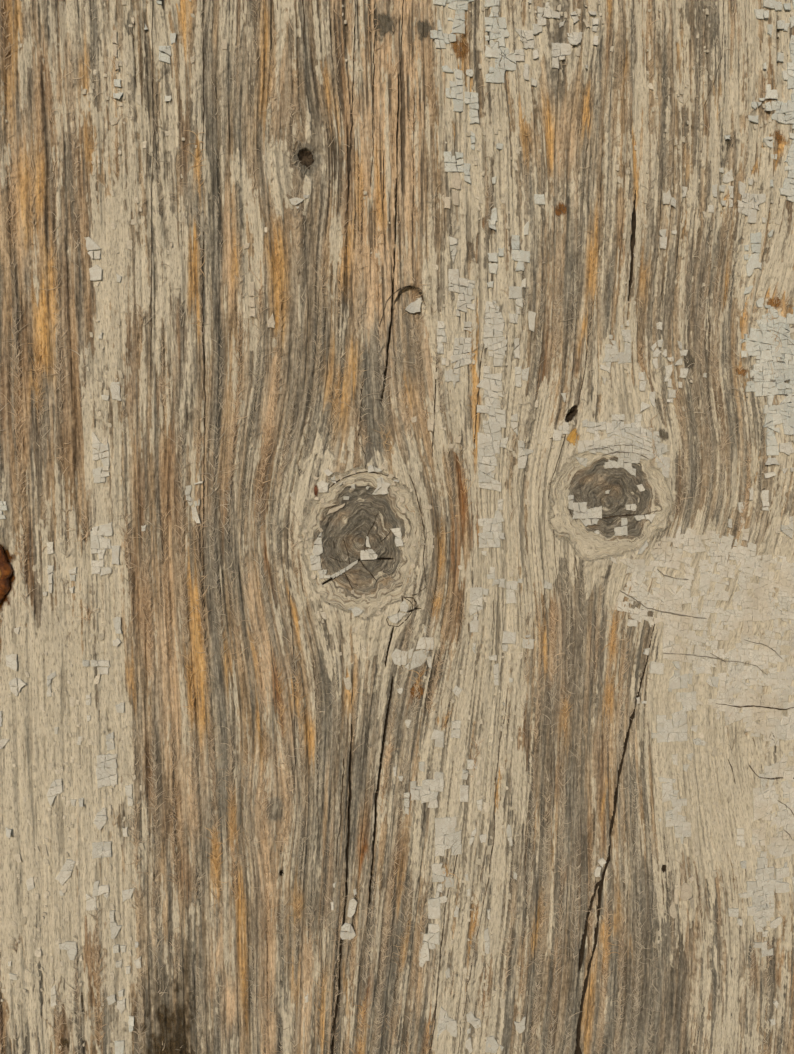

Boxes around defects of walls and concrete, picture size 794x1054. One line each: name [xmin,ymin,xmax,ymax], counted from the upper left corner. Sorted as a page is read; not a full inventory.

peeling [489,208,497,230]
peeling [430,0,599,209]
corrosion [0,544,15,622]
crack [268,0,427,1054]
peeling [437,221,536,654]
peeling [610,0,794,957]
crack [575,590,782,1054]